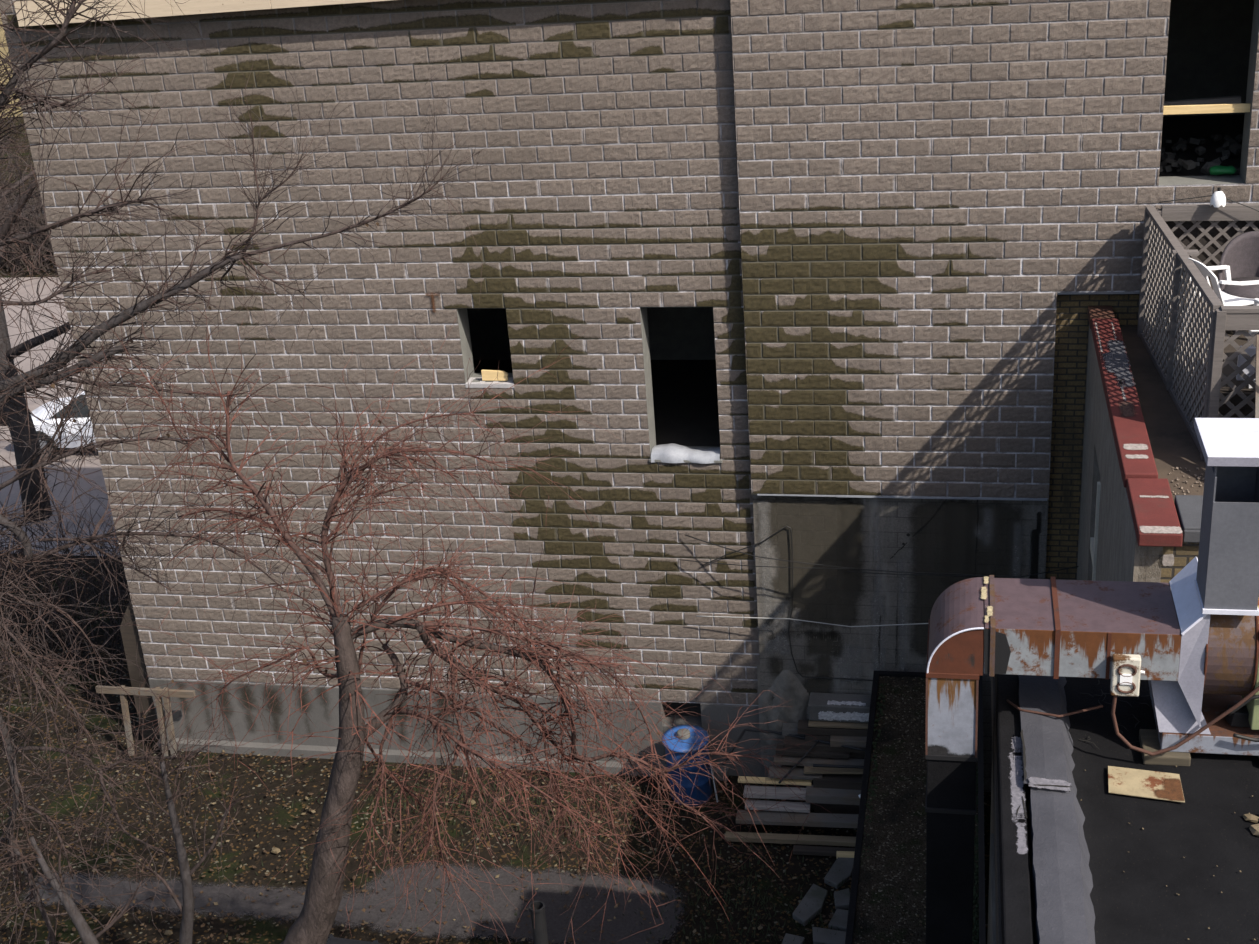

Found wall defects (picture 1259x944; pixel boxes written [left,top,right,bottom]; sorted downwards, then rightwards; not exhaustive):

leakage [199,0,731,154]
leakage [379,204,1022,696]